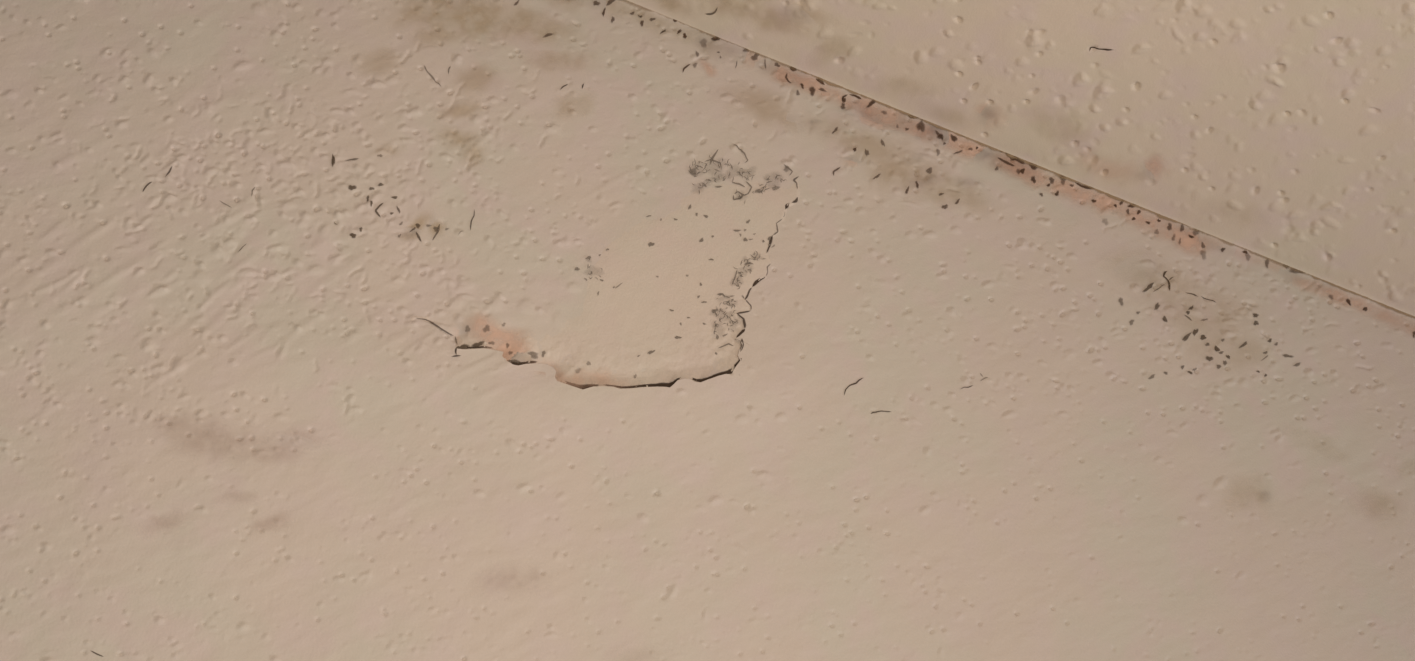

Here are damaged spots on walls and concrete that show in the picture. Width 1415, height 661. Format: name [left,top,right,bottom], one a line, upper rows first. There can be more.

peeling [410,176,807,414]
crack [646,144,793,355]